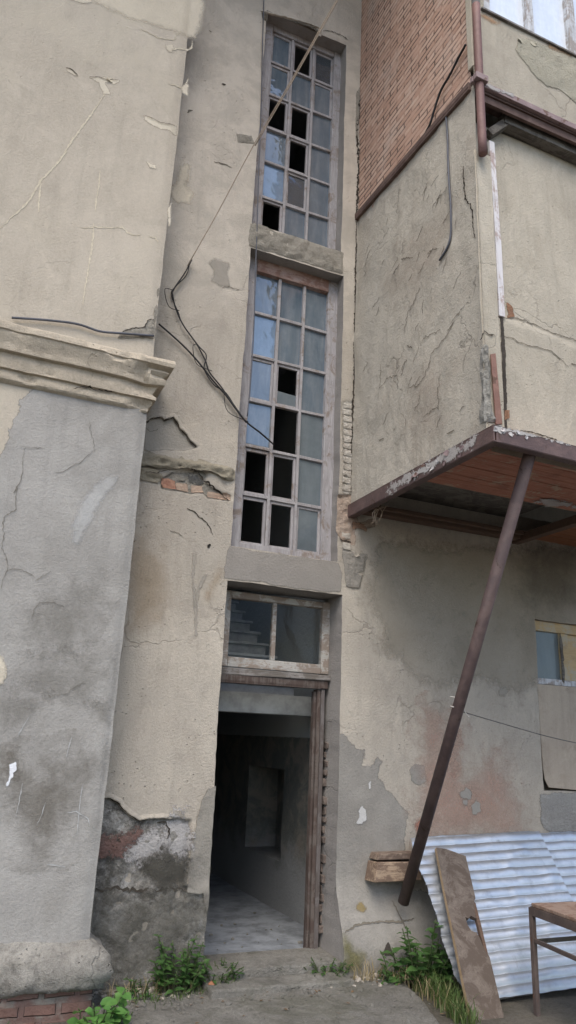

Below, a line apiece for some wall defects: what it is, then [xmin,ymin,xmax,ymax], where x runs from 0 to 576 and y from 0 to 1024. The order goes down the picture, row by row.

crack [363,166,475,428]
crack [1,446,64,619]
peeling [145,413,199,451]
flaking render [149,465,230,501]
spalling [336,400,375,589]
spalling [385,330,571,498]
spalling [92,793,209,992]
spalling [356,806,367,824]
crack [345,905,414,936]